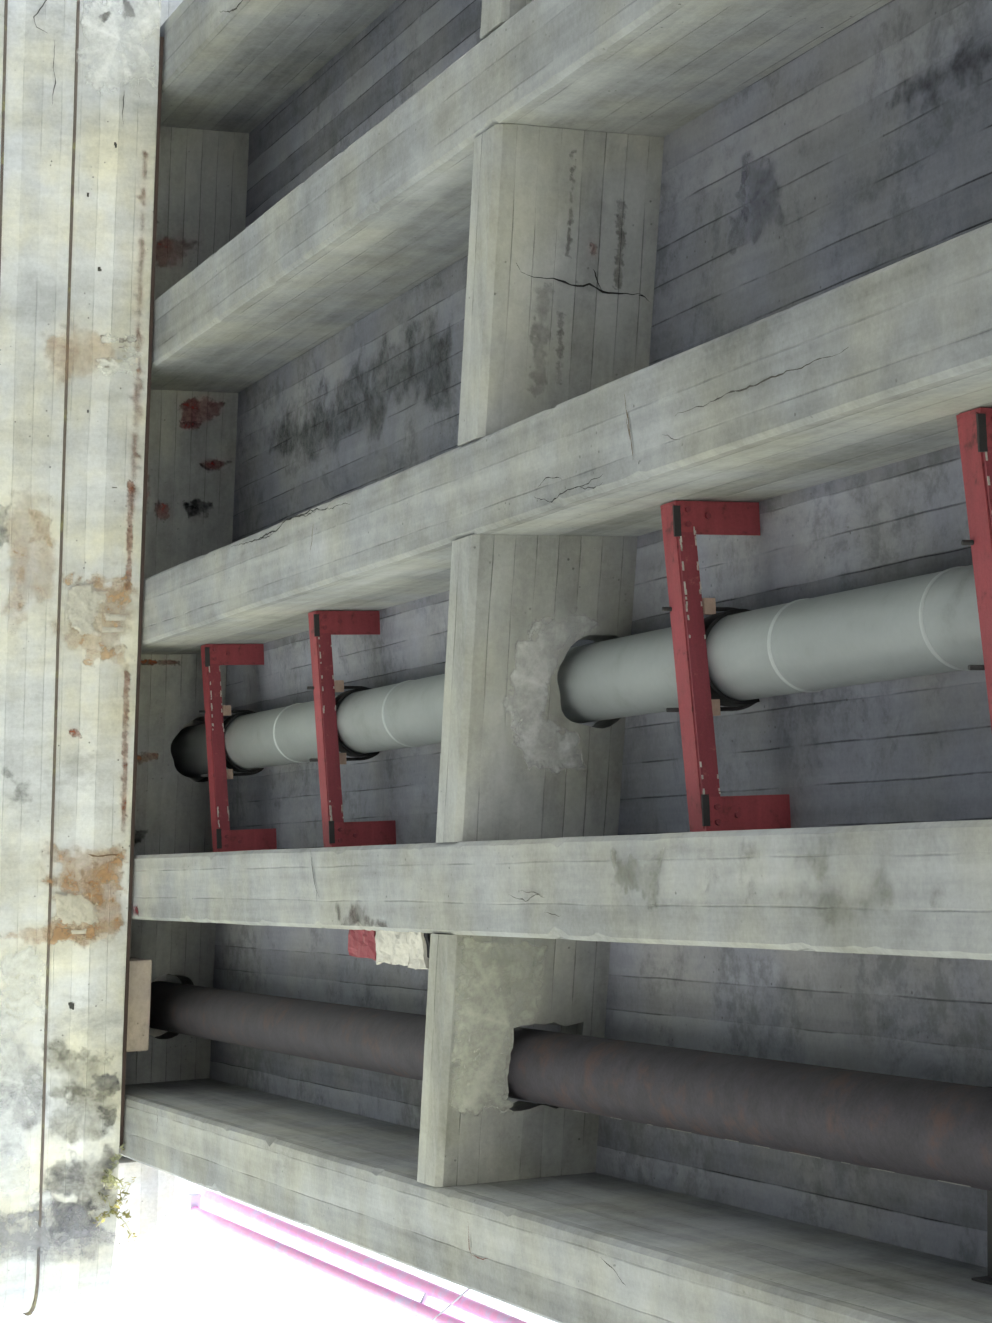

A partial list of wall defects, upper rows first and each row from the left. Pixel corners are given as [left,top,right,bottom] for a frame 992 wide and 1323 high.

damp [79,0,161,91]
crack [516,263,648,300]
rust [180,398,225,429]
damp [270,331,450,458]
rust [105,515,133,627]
rust [83,643,116,665]
rust [46,849,139,946]
spalling [338,907,432,970]
damp [0,949,120,1261]